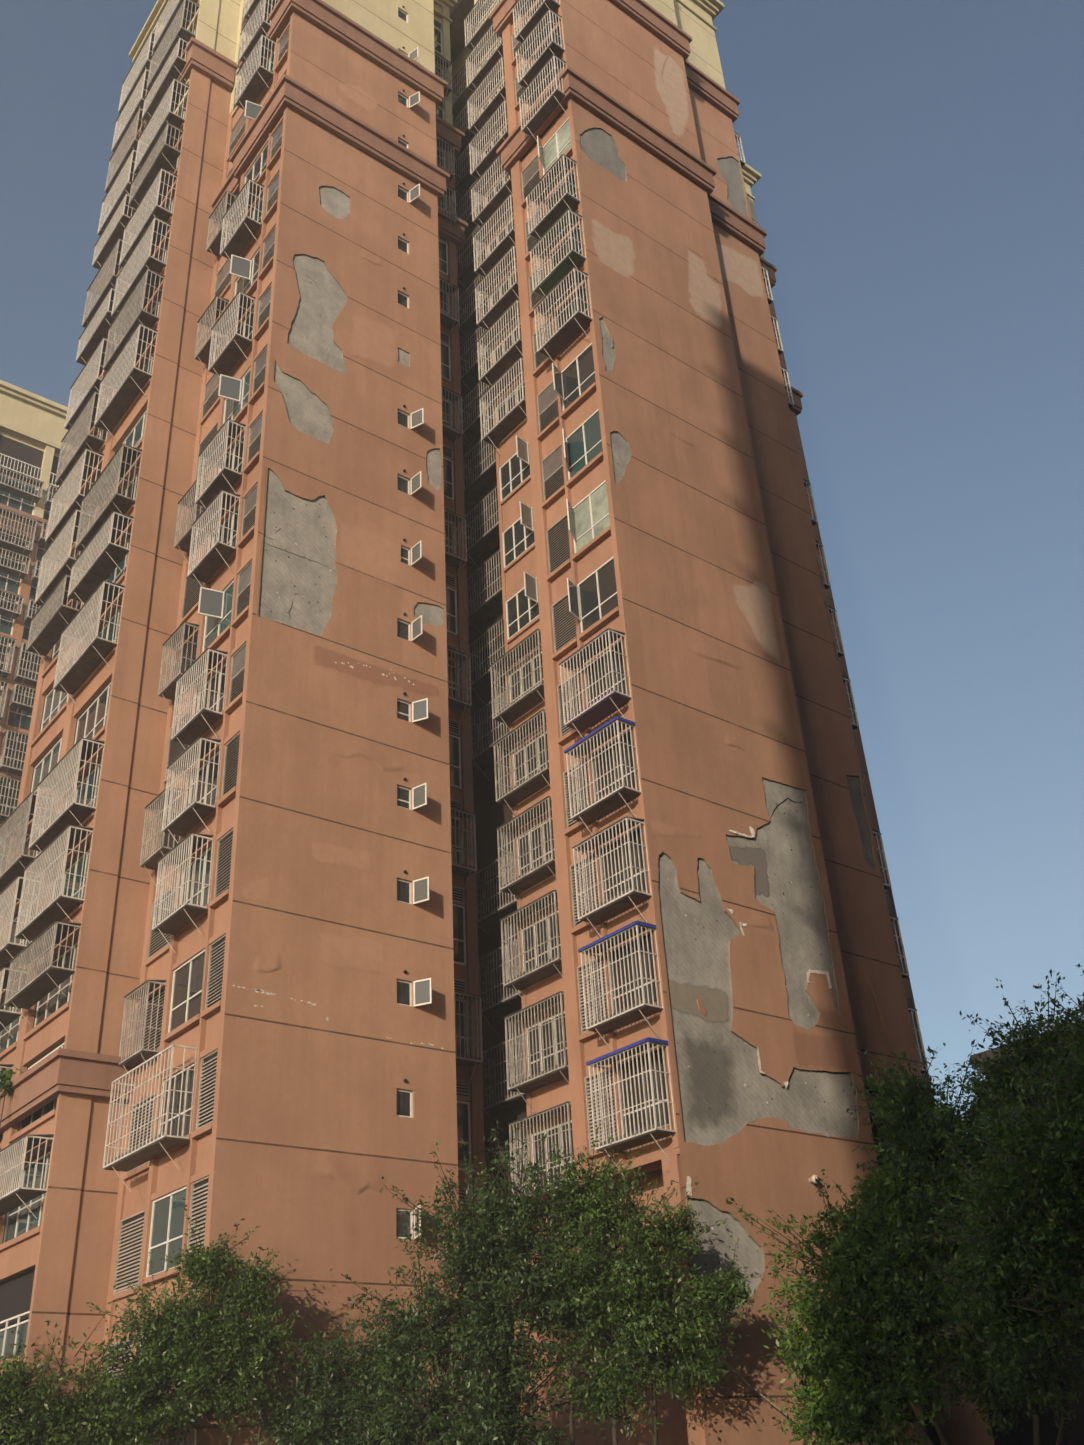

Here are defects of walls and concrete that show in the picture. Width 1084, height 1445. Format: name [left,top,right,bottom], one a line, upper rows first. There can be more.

spalling [319,185,351,219]
spalling [580,127,627,181]
spalling [717,156,749,219]
spalling [287,254,347,374]
spalling [599,317,616,371]
spalling [274,360,334,444]
spalling [610,431,633,484]
spalling [258,468,338,636]
spalling [726,777,841,1030]
spalling [658,852,860,1146]
spalling [685,1176,765,1325]